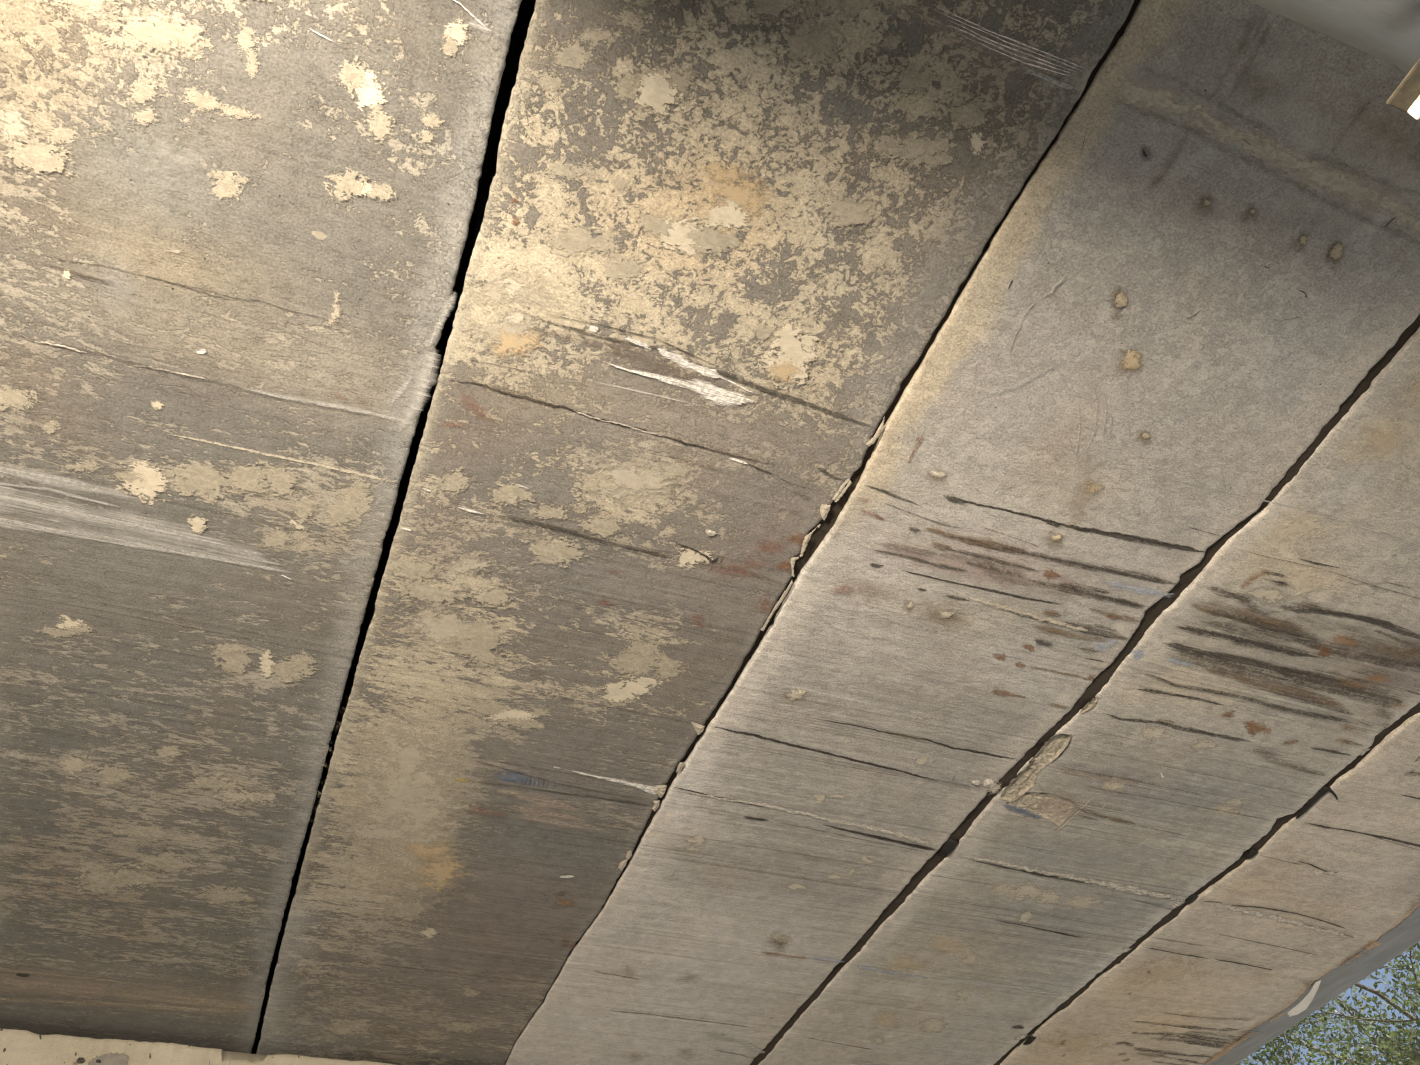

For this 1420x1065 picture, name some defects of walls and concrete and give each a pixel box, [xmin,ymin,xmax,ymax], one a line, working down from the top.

crack [43,255,321,318]
crack [450,359,771,465]
leakage [522,312,870,427]
peeling [676,530,722,569]
spalling [760,478,852,631]
crack [943,495,1215,552]
spalling [651,762,685,811]
spalling [952,734,1076,826]